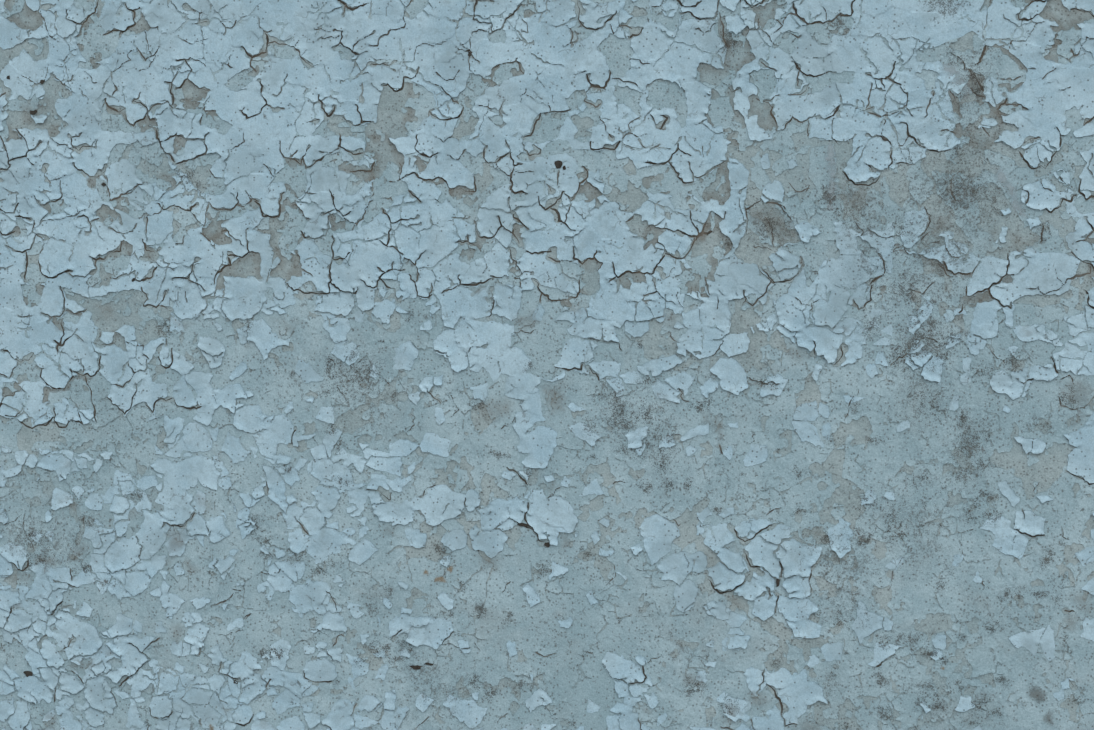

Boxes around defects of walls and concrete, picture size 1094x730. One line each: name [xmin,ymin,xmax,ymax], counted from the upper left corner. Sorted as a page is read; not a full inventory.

crack [0,0,1094,429]
peeling [761,153,784,203]
peeling [751,221,895,366]
peeling [900,146,1094,400]
peeling [0,0,776,730]
peeling [1014,436,1046,454]
peeling [1064,412,1094,483]
crack [40,568,84,702]
crack [304,591,344,683]
peeling [630,507,854,730]
crack [708,508,783,613]
peeling [980,481,1053,559]